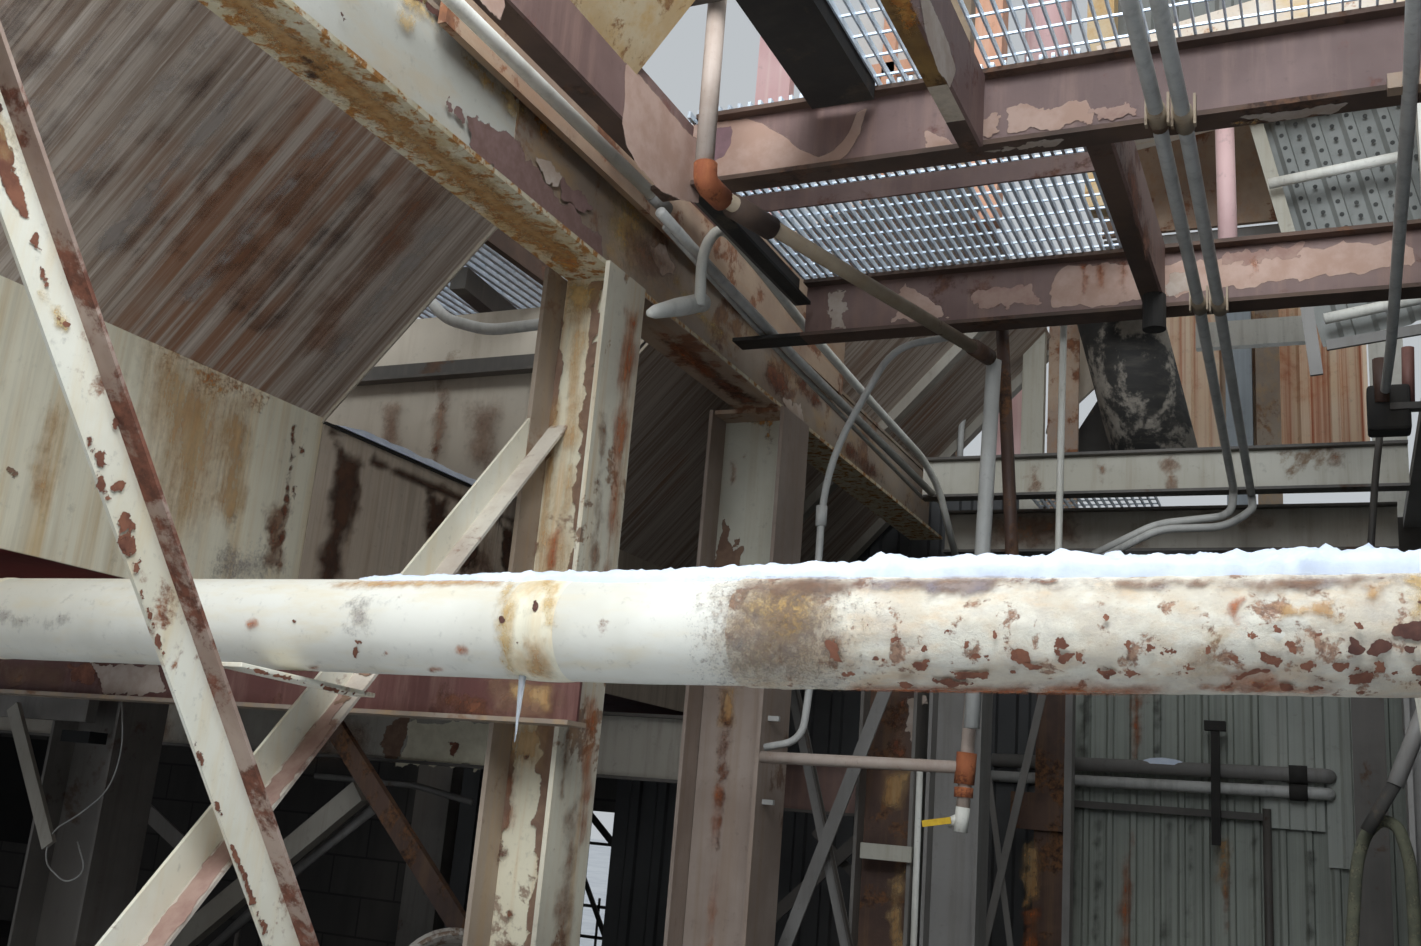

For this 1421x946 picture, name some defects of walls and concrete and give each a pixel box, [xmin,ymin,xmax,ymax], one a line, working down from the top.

peeling [983,100,1137,138]
rust [0,104,49,287]
peeling [446,96,603,257]
peeling [971,262,1141,310]
peeling [1165,240,1415,298]
rust [87,437,126,501]
peeling [567,280,604,571]
rust [117,512,142,574]
rust [1247,602,1333,655]
rust [1042,637,1148,739]
rust [880,681,1025,805]
peeling [523,725,555,946]